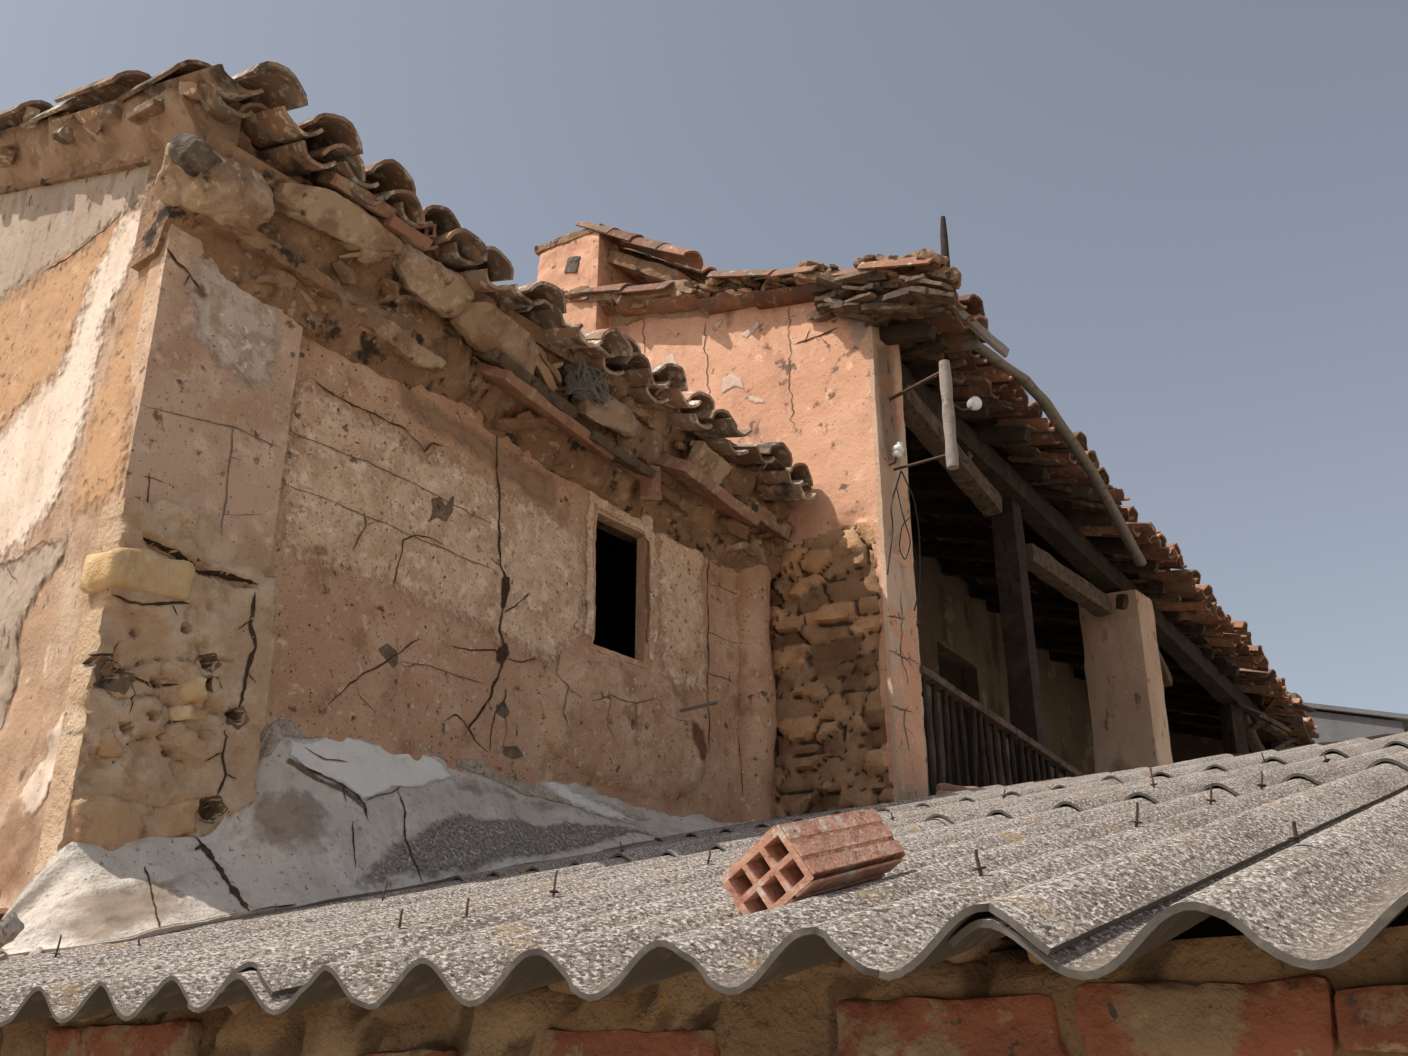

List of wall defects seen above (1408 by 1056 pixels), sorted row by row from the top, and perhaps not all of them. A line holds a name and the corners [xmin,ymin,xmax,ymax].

flaking render [0,165,150,563]
crack [143,475,163,503]
crack [148,374,743,795]
spalling [82,656,136,694]
crack [89,643,178,714]
crack [113,537,257,795]
spalling [177,675,210,704]
spalling [68,793,201,851]
crack [298,747,423,882]
crack [85,837,296,944]